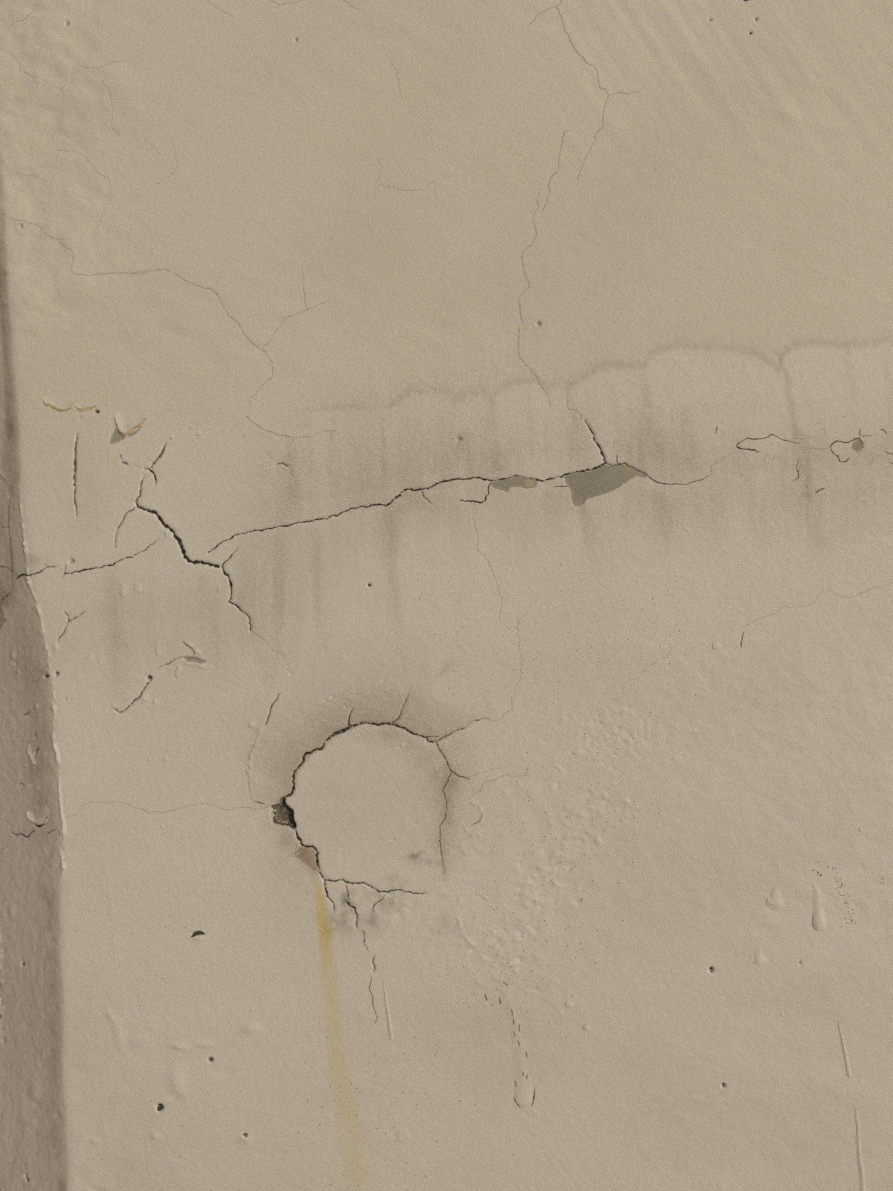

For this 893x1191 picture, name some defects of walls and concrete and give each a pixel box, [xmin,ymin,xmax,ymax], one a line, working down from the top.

peeling [109,389,149,444]
crack [0,0,893,866]
spalling [490,476,537,492]
spalling [564,465,646,506]
spalling [271,797,297,829]
crack [295,830,424,1023]